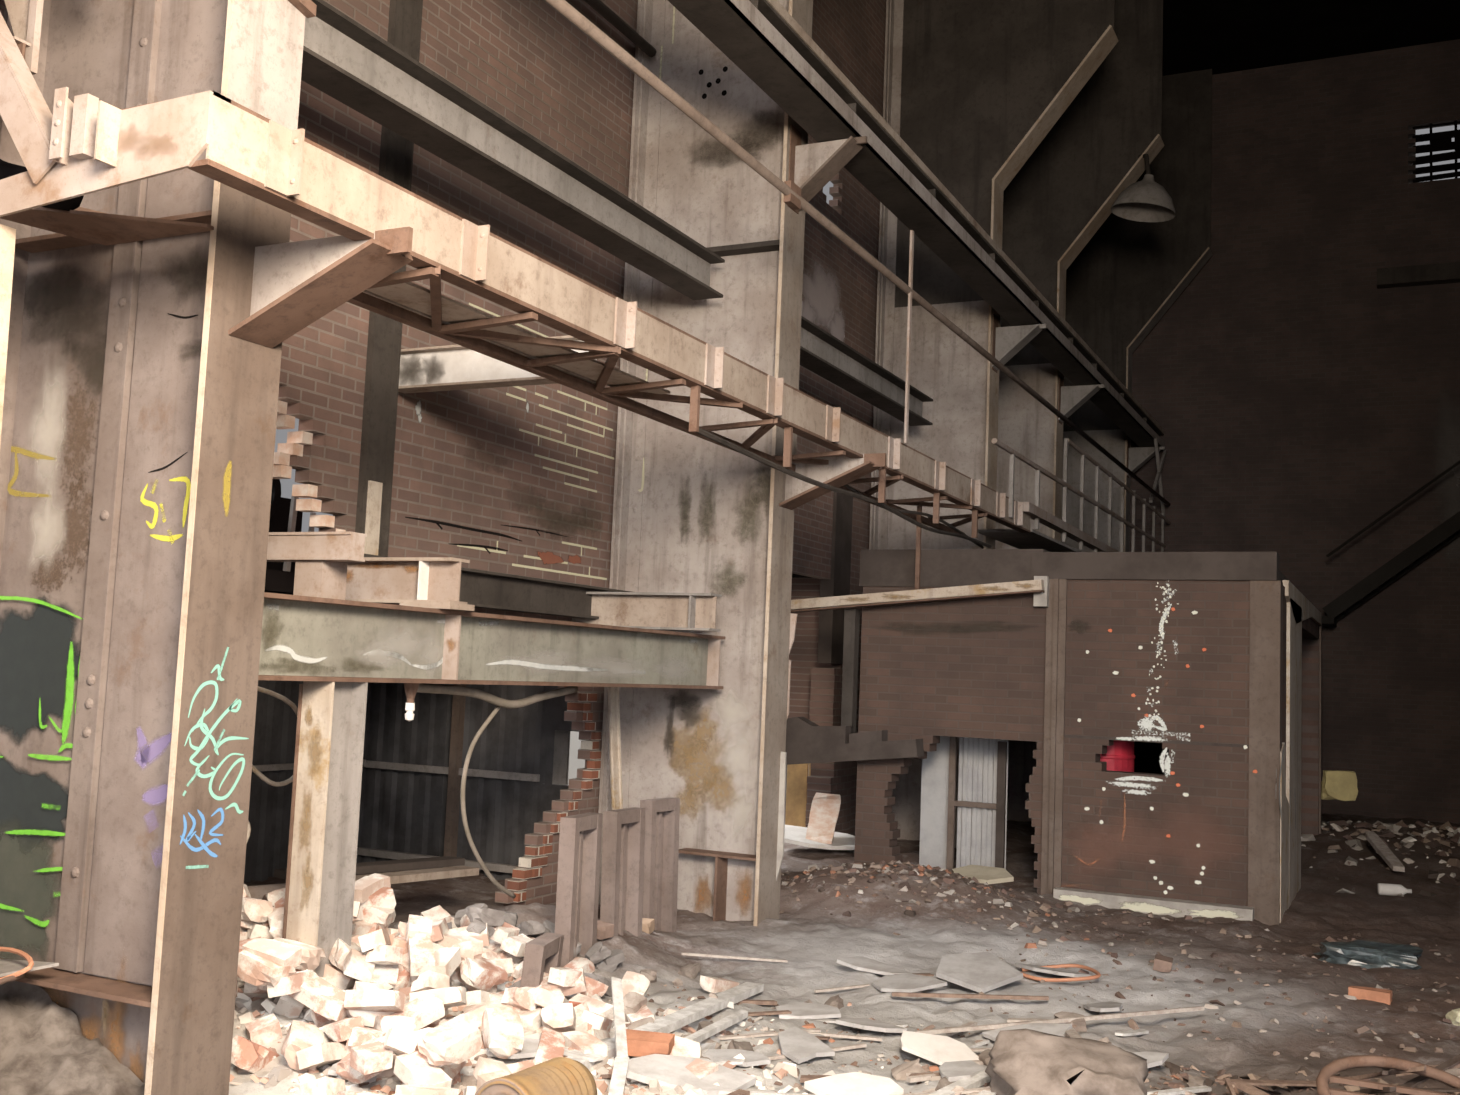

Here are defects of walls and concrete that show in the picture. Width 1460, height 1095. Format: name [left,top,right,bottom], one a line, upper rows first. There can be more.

crack [405,517,568,554]
damp [665,692,699,750]